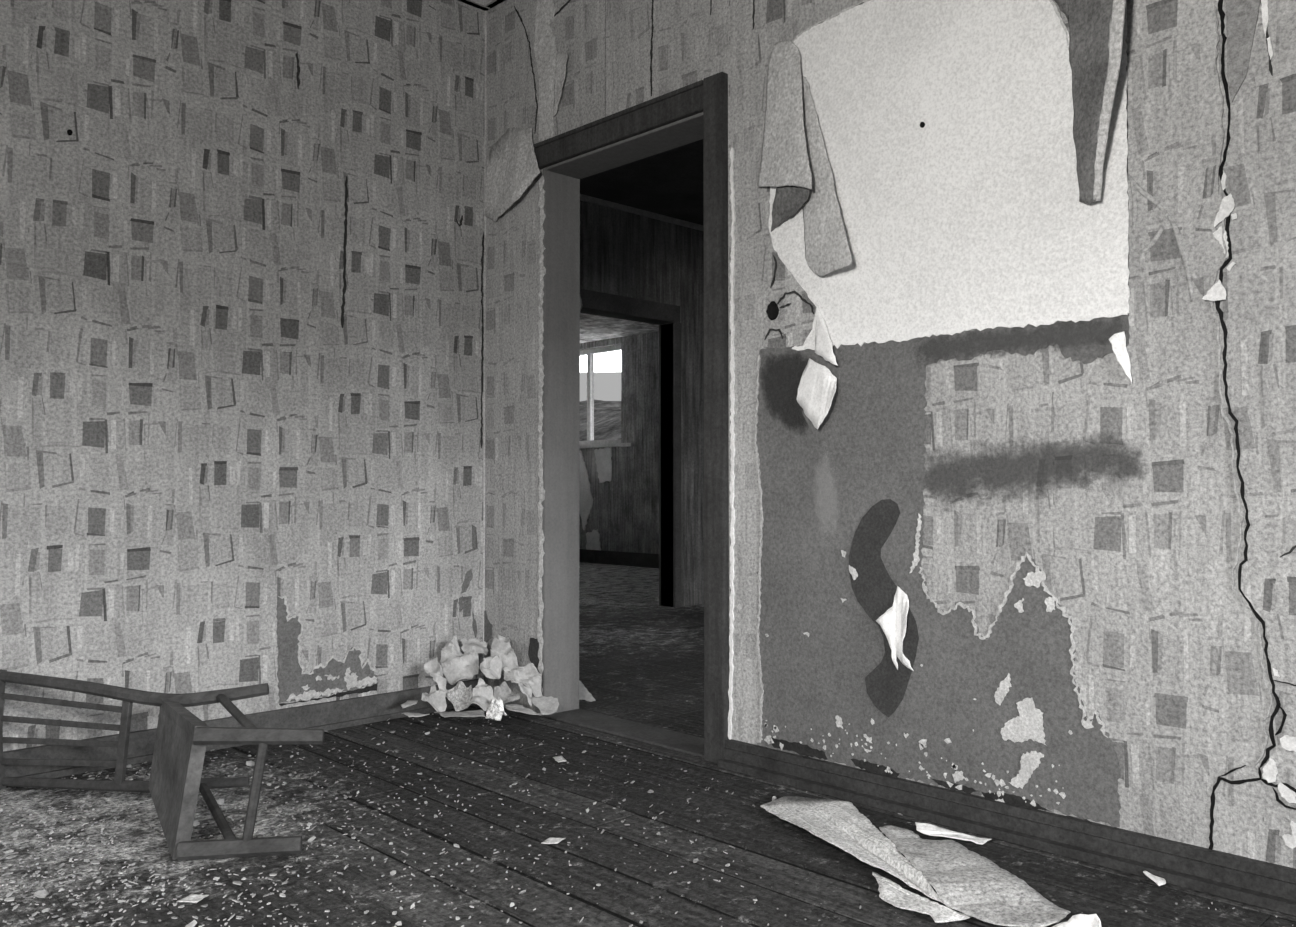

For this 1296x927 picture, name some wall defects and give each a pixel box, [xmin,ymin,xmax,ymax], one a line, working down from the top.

peeling [514,0,571,141]
peeling [728,0,1130,827]
damp [923,440,1139,498]
crack [1202,0,1296,850]
peeling [276,595,378,706]